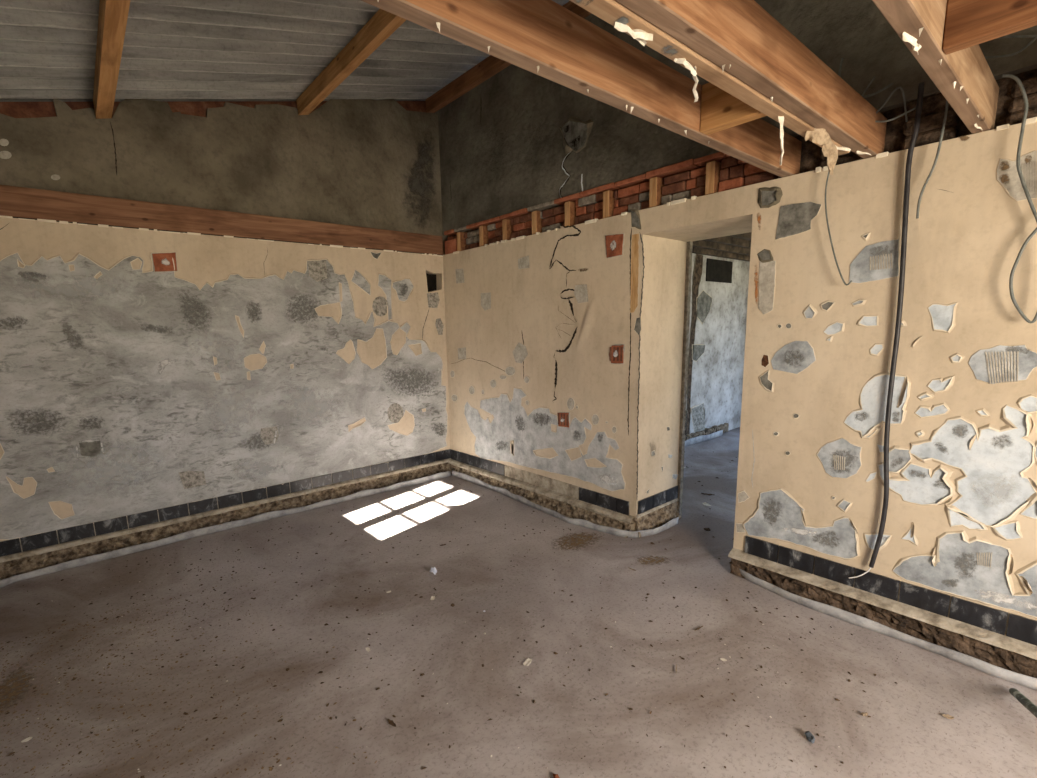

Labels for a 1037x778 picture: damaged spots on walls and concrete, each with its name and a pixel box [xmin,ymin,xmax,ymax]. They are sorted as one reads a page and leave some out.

crack [559,153,583,198]
flaking render [758,186,783,208]
flaking render [605,209,641,258]
flaking render [757,249,774,263]
crack [549,225,581,403]
peeling [696,290,712,325]
peeling [802,299,879,342]
peeling [927,302,958,333]
peeling [869,343,884,356]
peeling [0,252,682,580]
peeling [735,352,1037,619]
flaking render [730,558,1037,678]